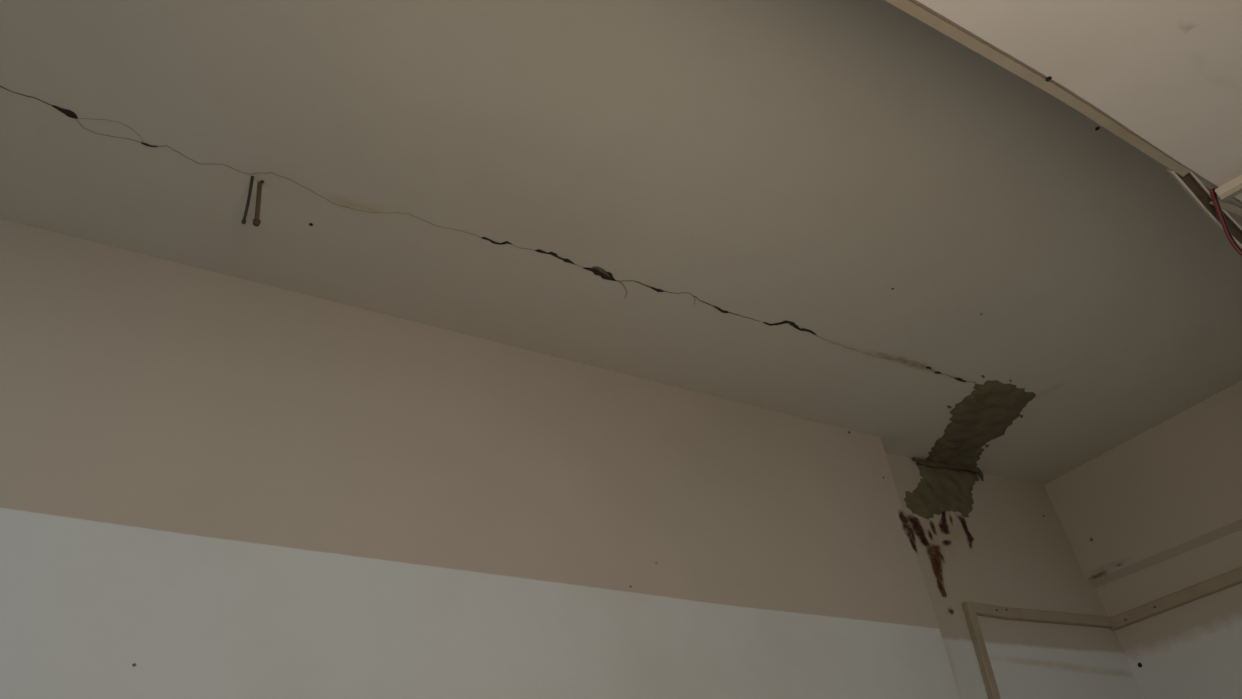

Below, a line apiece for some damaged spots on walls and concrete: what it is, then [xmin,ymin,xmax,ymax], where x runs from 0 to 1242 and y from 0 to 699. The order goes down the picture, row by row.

crack [0,86,977,383]
rust [899,511,976,614]